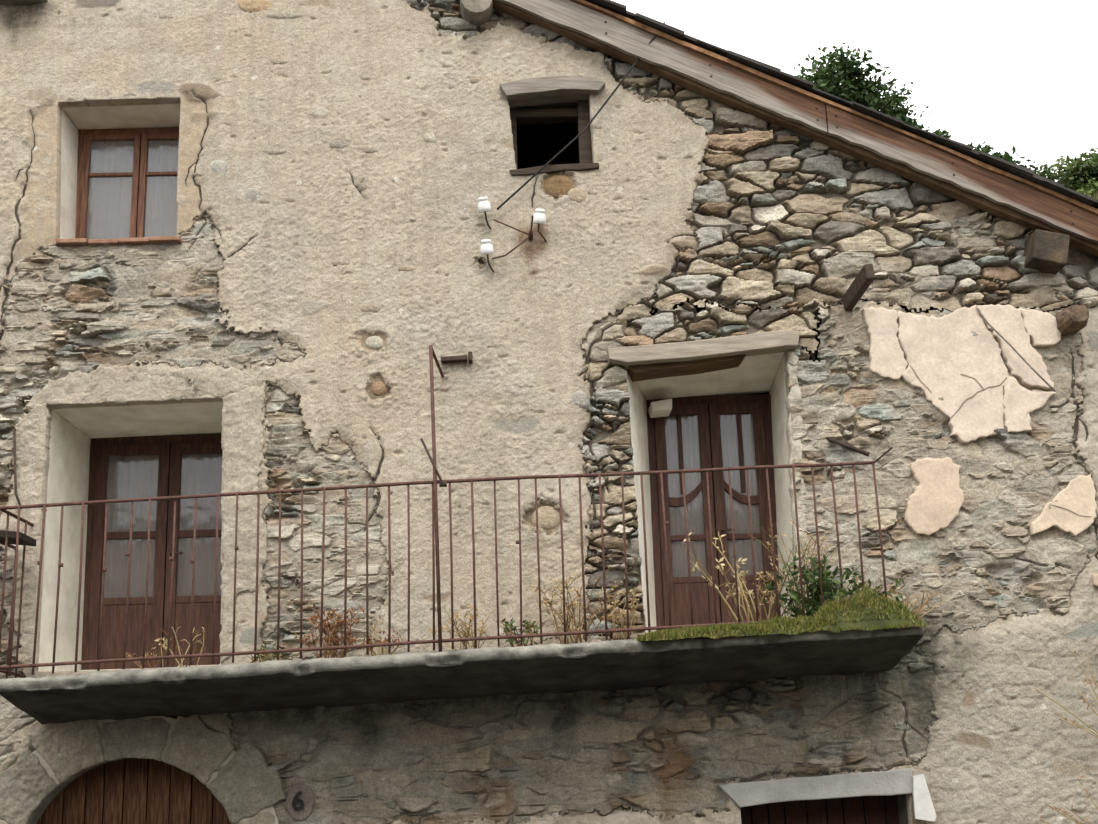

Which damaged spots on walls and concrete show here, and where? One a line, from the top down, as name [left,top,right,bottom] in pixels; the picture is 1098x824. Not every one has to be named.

crack [0,116,35,339]
spalling [0,213,307,516]
crack [185,91,256,258]
spalling [227,0,1098,824]